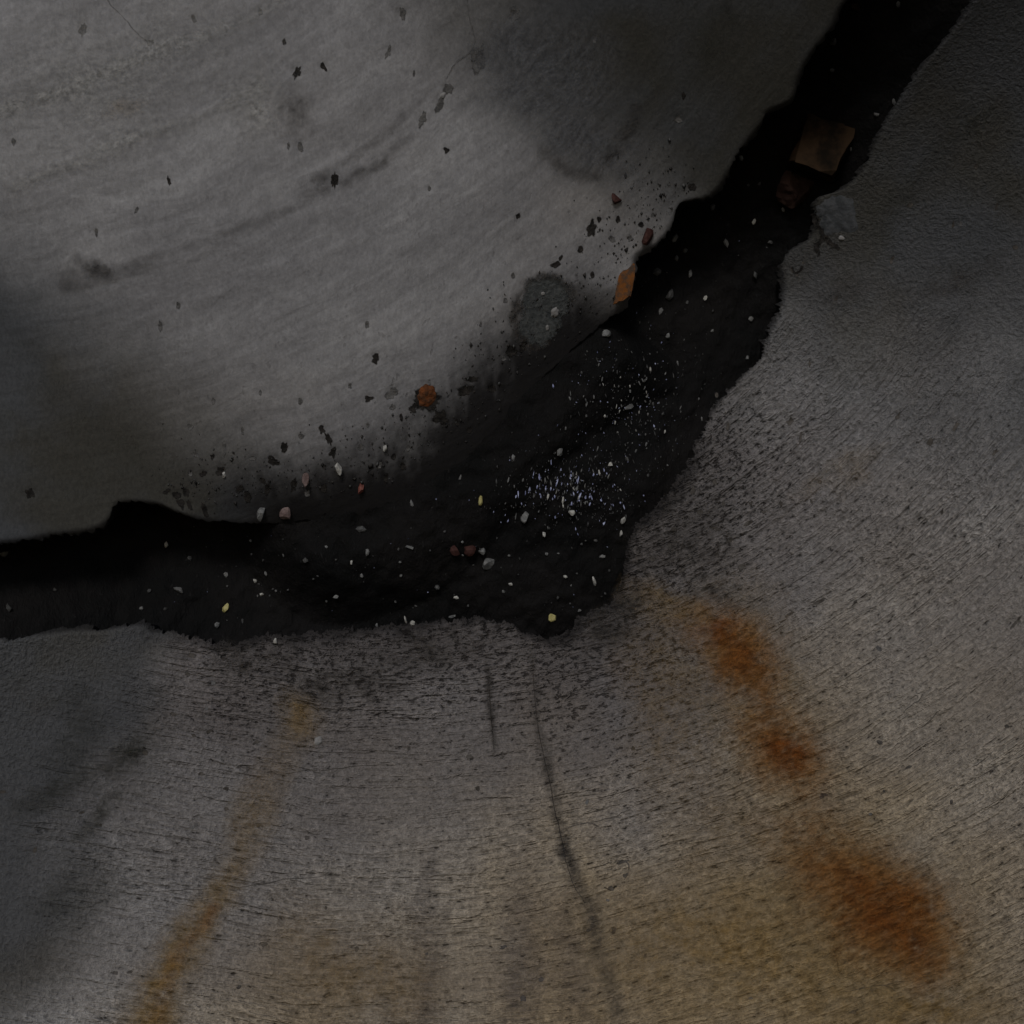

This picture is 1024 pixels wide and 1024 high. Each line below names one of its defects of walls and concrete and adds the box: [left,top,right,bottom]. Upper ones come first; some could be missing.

spalling [419,84,453,128]
spalling [577,217,601,253]
spalling [810,195,858,256]
spalling [501,255,574,361]
spalling [365,384,448,425]
spalling [268,442,288,466]
spalling [319,425,336,459]
corrosion [710,619,766,691]
crack [533,677,629,927]
corrosion [804,864,938,965]